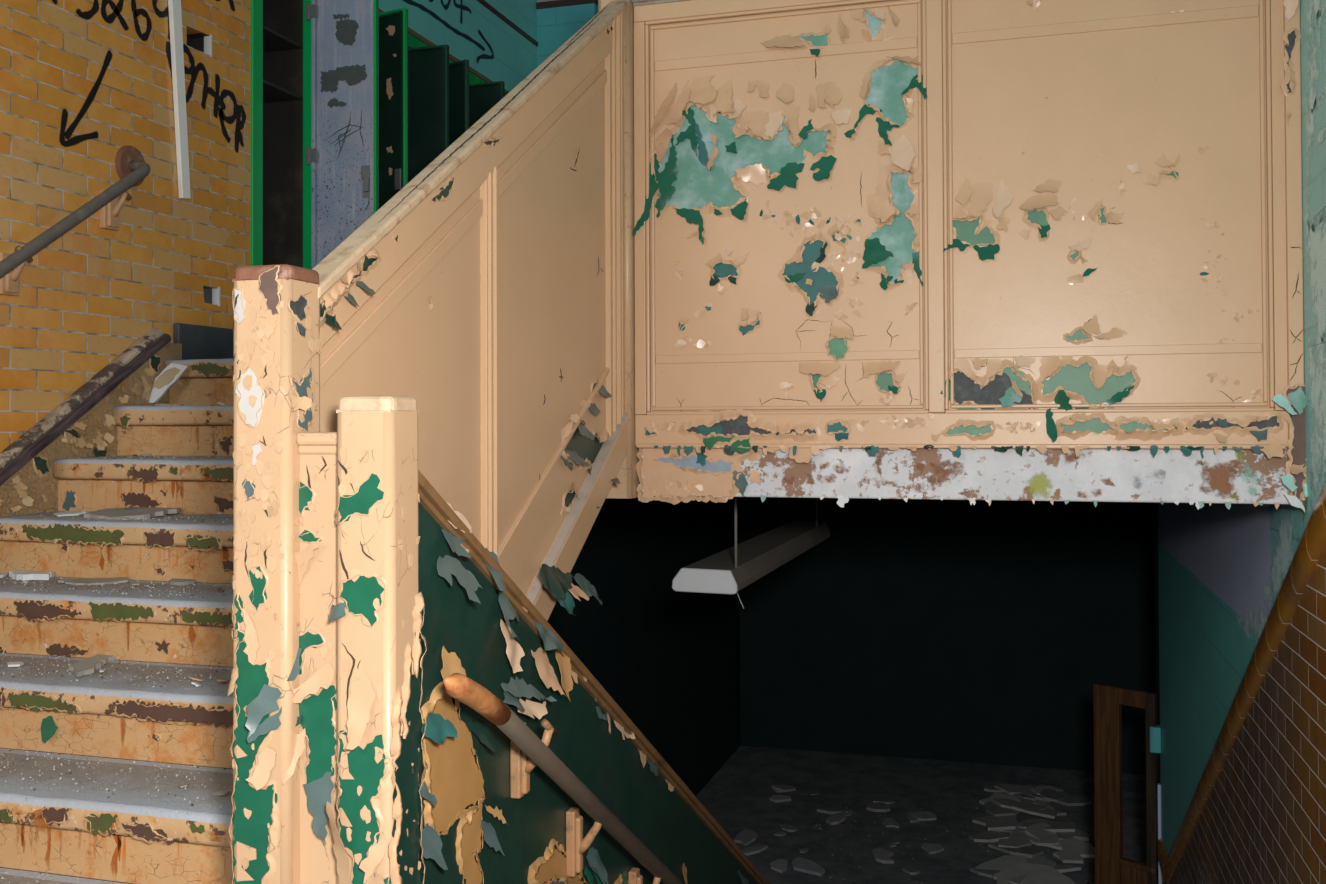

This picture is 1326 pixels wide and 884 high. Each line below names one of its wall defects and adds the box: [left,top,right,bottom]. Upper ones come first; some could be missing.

peeling [761,3,900,57]
peeling [632,56,927,319]
peeling [943,176,1068,260]
peeling [1066,197,1124,285]
peeling [559,378,612,517]
damp [784,464,848,484]
damp [912,460,961,492]
peeling [636,315,1308,512]
damp [1029,474,1051,496]
damp [1197,451,1257,497]
peeling [0,248,509,884]
peeling [527,839,588,884]